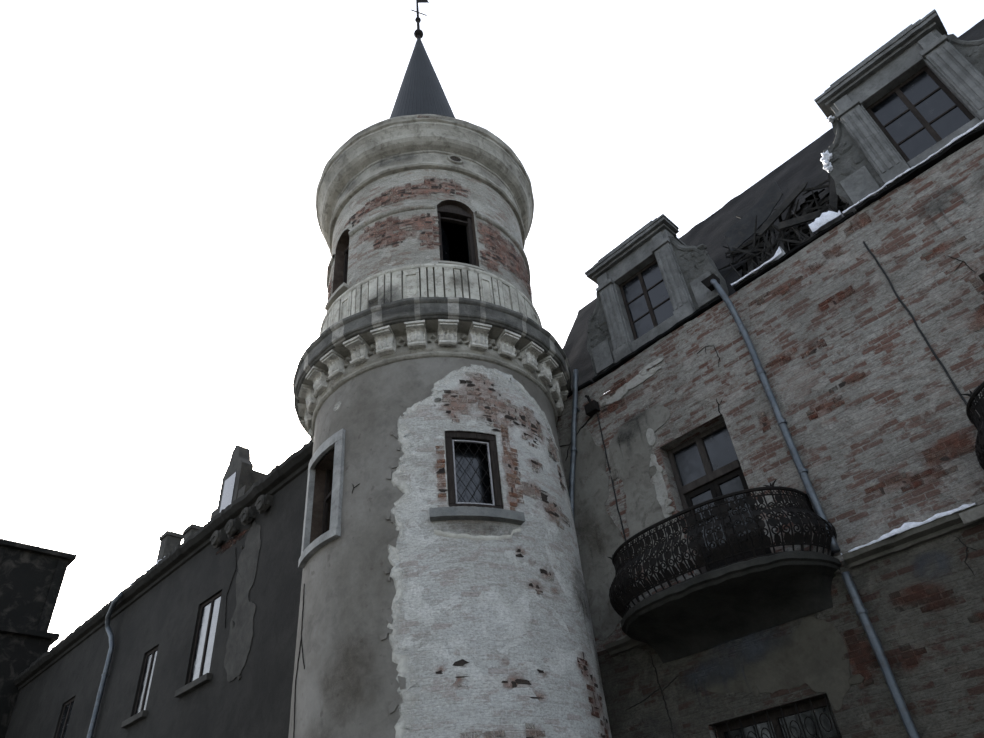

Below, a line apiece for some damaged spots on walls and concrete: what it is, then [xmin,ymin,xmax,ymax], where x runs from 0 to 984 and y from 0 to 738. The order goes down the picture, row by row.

spalling [346,177,468,248]
spalling [477,222,534,304]
peeling [379,358,682,738]